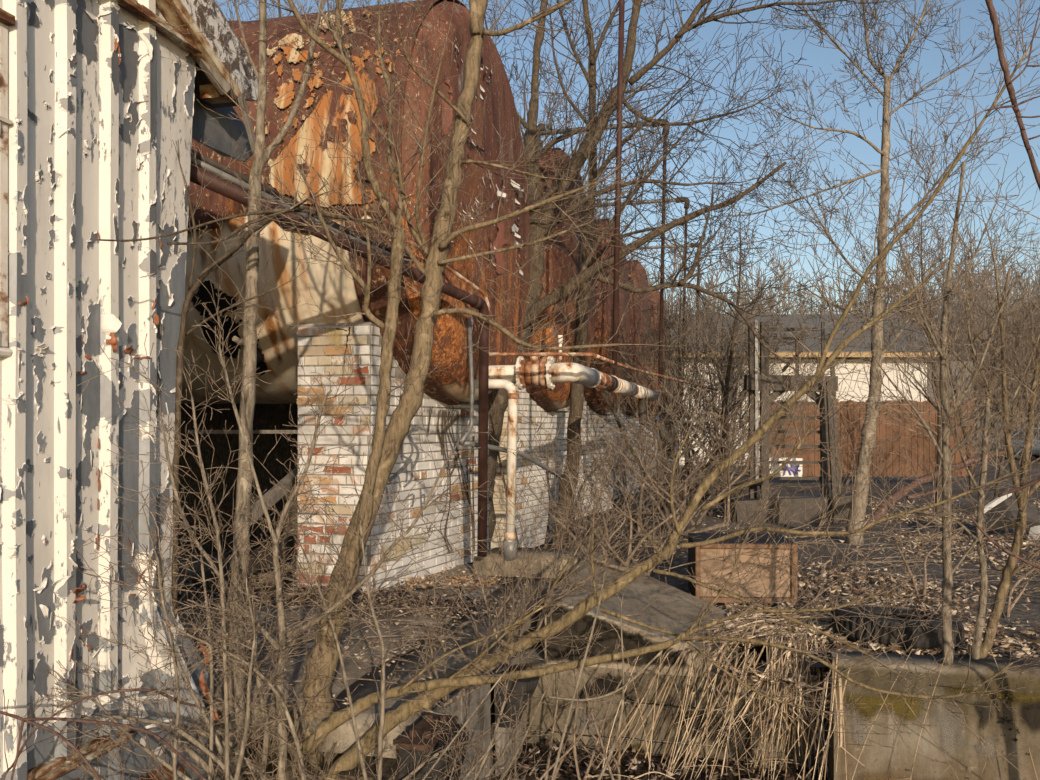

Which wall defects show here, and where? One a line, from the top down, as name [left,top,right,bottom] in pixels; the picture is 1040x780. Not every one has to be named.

peeling [11,0,157,171]
peeling [170,52,196,119]
peeling [442,36,463,136]
rust [326,111,357,142]
rust [353,163,371,200]
rust [200,216,245,266]
peeling [451,174,527,286]
rust [265,309,288,364]
peeling [323,345,369,385]
peeling [296,387,352,425]
peeling [0,157,210,780]
water stain [1023,702,1040,730]